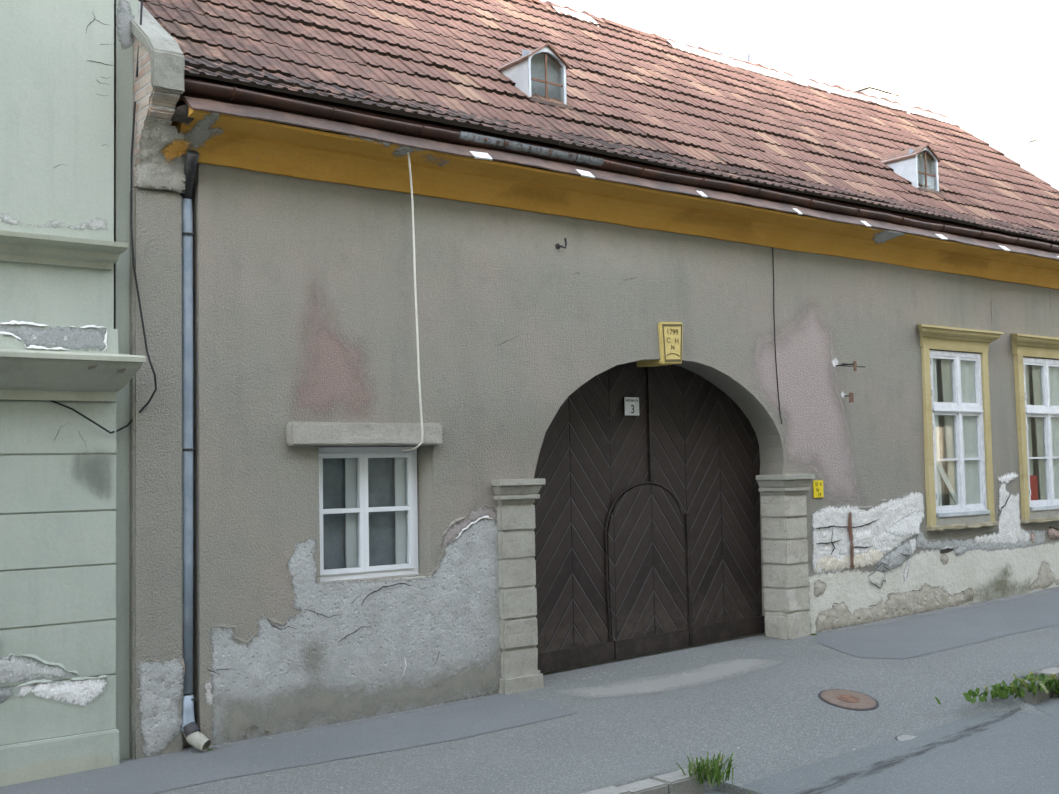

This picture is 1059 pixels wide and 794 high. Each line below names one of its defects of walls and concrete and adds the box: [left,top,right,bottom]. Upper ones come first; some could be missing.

spalling [136,105,224,192]
spalling [0,320,107,351]
spalling [811,472,1059,633]
peeling [205,505,501,745]
peeling [0,653,109,707]
spalling [138,657,185,756]